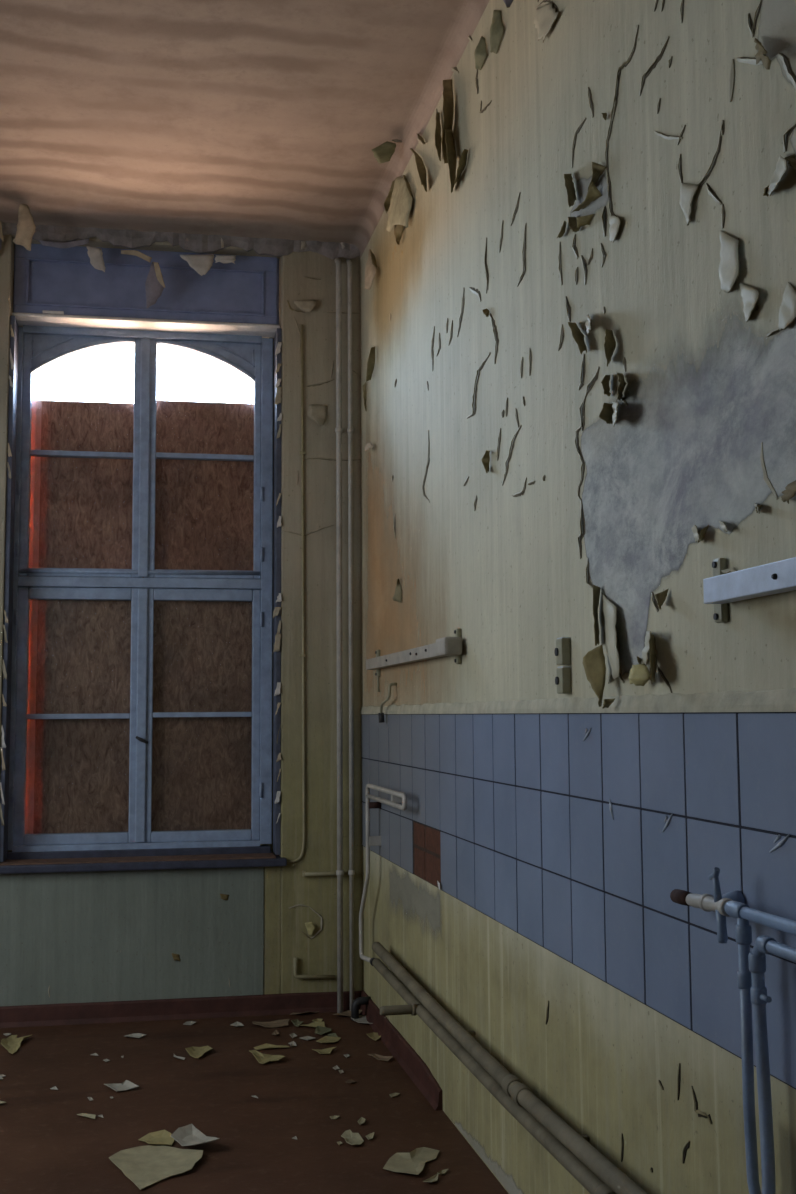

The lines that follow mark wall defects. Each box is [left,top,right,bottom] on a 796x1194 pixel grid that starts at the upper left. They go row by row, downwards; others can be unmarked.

peeling [533,0,559,43]
peeling [729,0,796,102]
peeling [372,79,468,245]
peeling [13,204,106,272]
peeling [121,250,166,308]
peeling [180,238,236,276]
peeling [557,120,796,708]